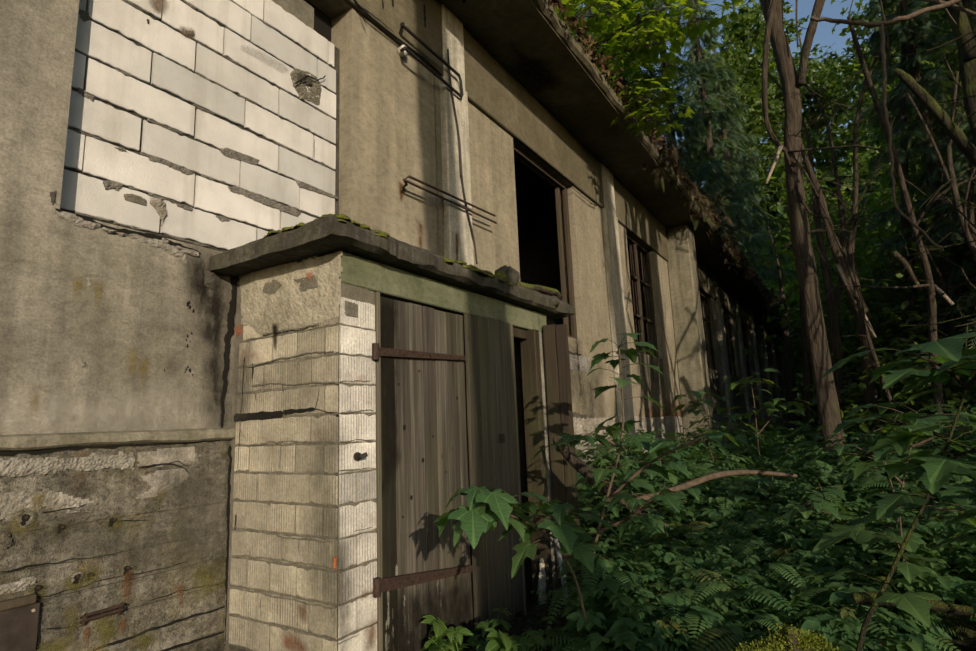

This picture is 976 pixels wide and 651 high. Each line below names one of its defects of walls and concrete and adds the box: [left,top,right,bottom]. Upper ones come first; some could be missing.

spalling [290,68,326,106]
spalling [50,190,199,264]
flaking render [0,447,198,499]
crack [0,276,374,651]
flaking render [0,488,94,522]